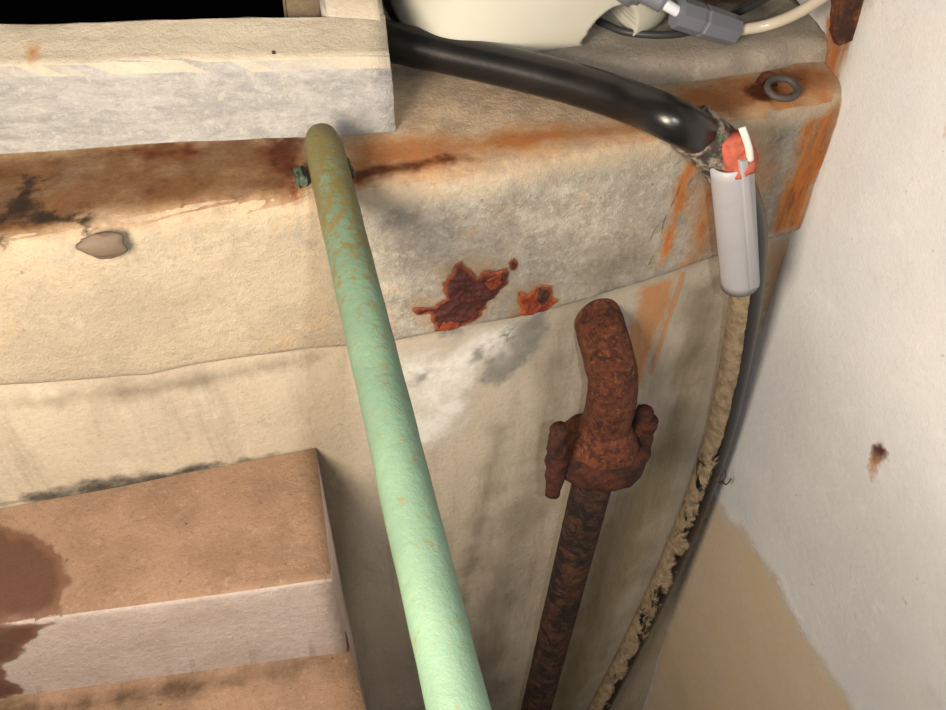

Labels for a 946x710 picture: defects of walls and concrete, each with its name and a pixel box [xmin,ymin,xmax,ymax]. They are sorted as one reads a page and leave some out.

corrosion [677,18,849,232]
corrosion [0,137,306,236]
corrosion [662,162,695,258]
corrosion [630,273,685,383]
leakage [401,323,516,445]
corrosion [871,444,886,470]
leakage [0,527,70,699]